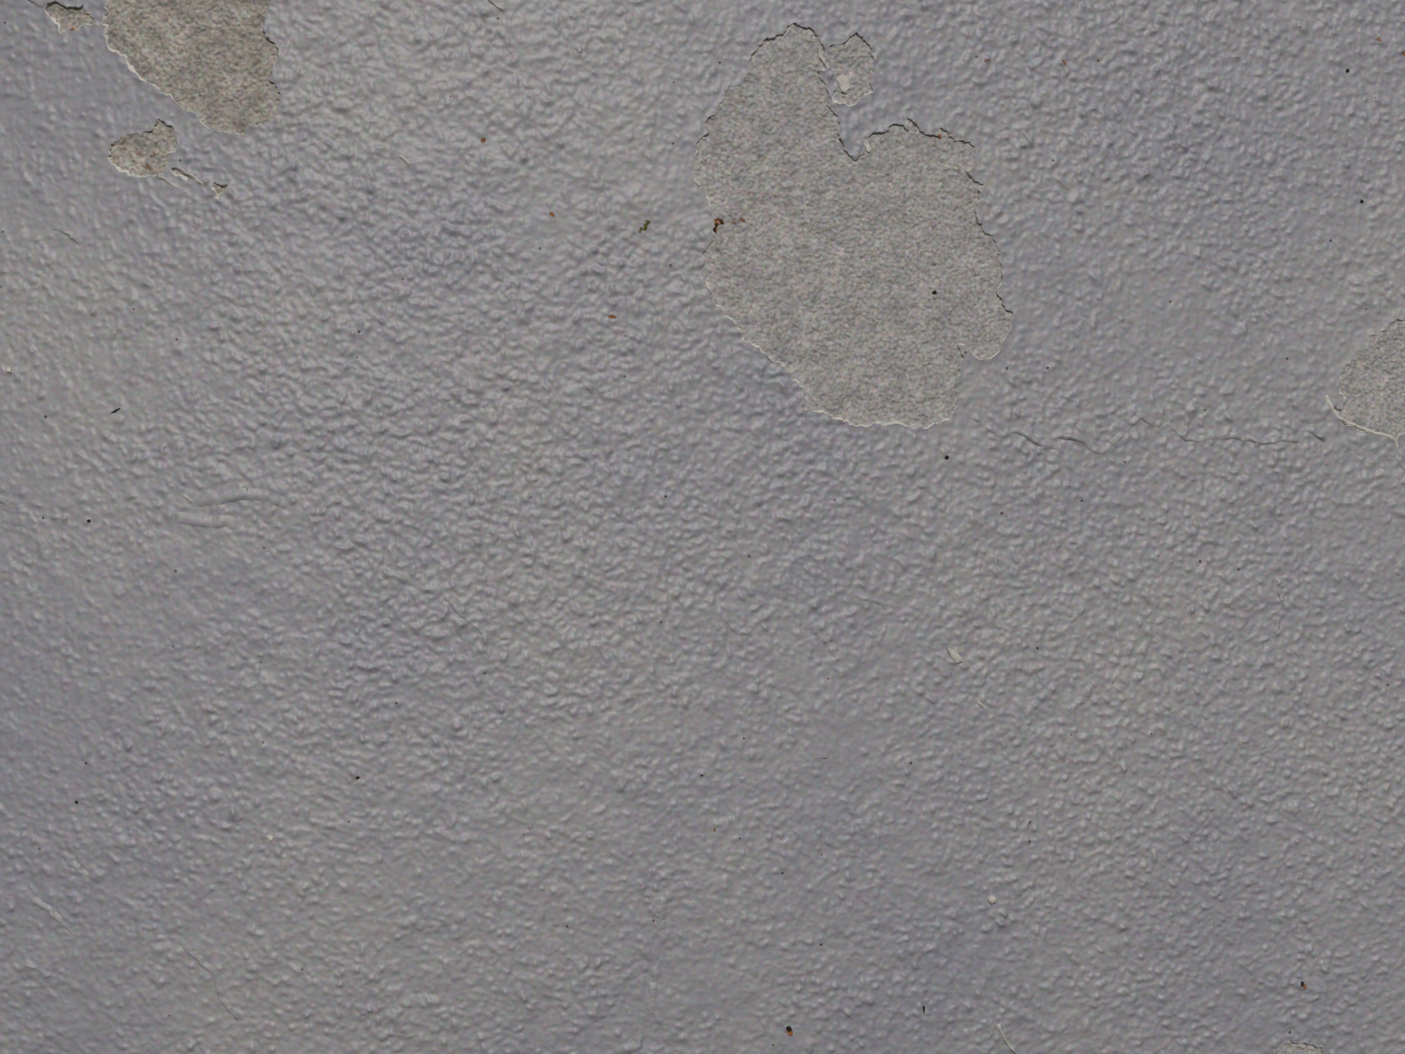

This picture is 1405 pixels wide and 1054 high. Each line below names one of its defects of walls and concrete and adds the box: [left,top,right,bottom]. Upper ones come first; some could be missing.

peeling [44,0,282,140]
peeling [106,115,194,184]
peeling [692,22,1015,431]
peeling [1325,318,1405,447]